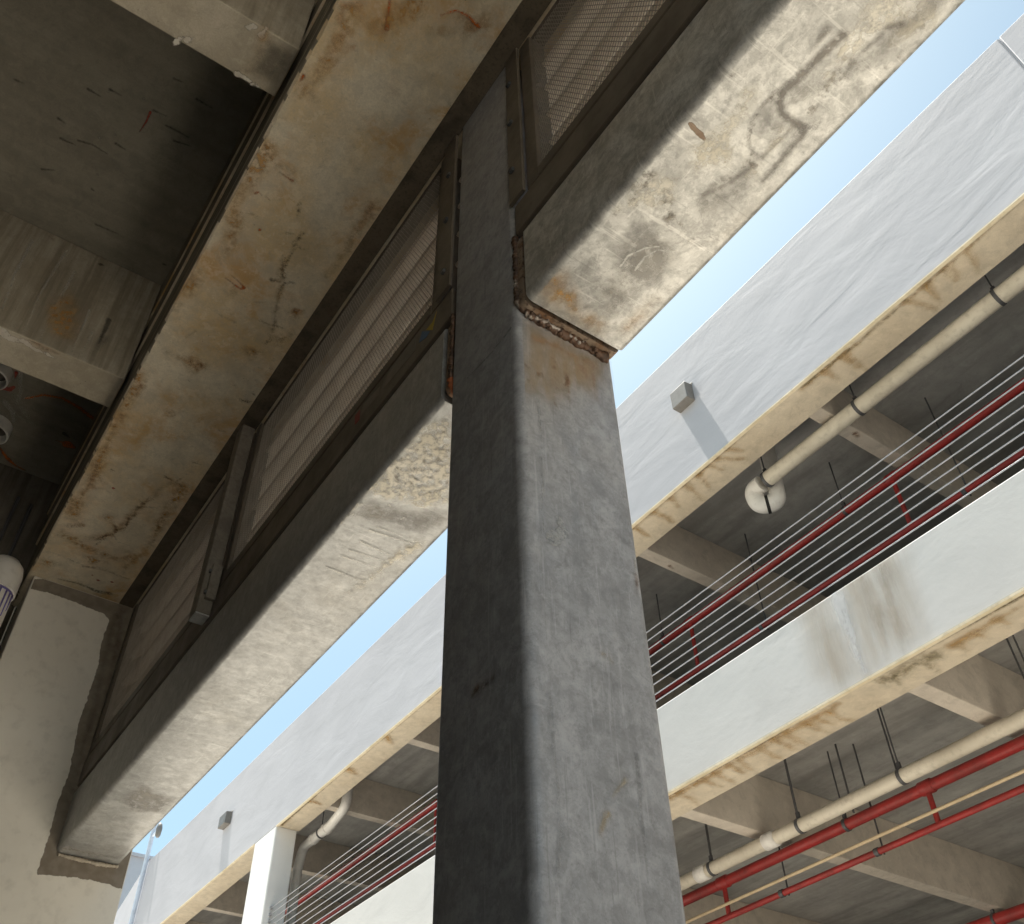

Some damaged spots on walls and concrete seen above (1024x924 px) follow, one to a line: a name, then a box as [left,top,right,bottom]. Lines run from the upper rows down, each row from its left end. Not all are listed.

leakage [719,32,847,192]